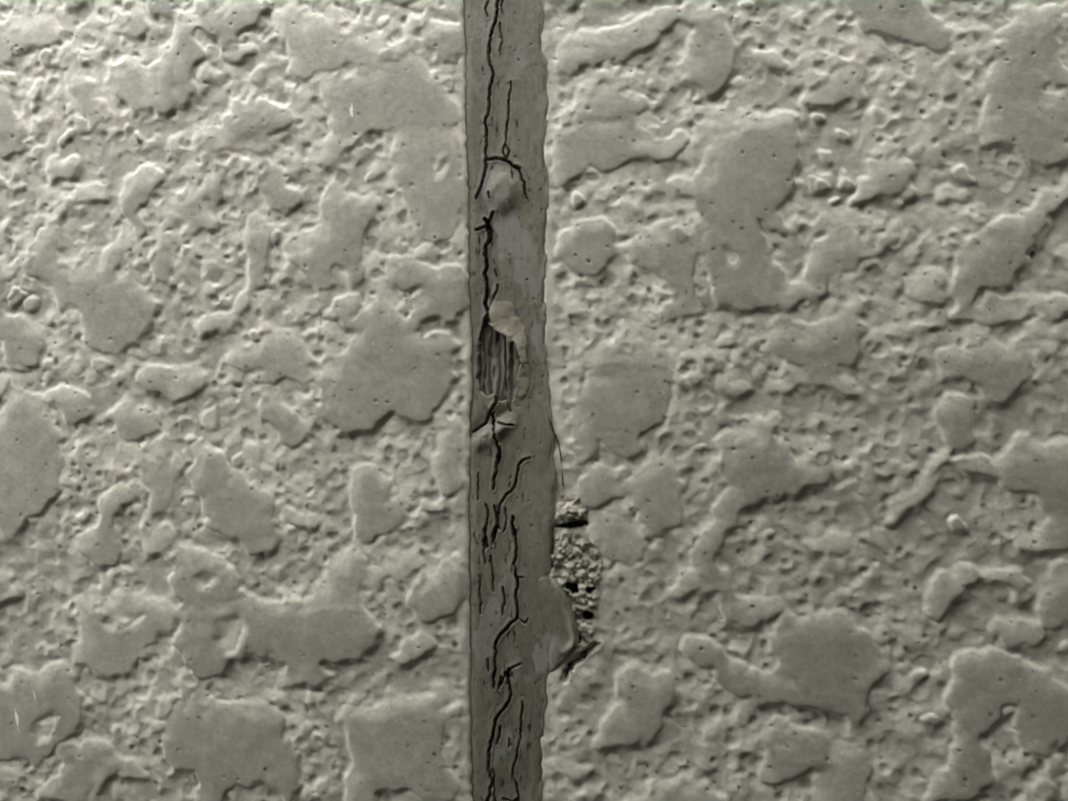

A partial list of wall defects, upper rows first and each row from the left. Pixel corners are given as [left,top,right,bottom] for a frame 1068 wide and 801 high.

crack [474,0,530,332]
peeling [478,300,530,410]
crack [473,399,531,801]
spalling [550,493,603,644]